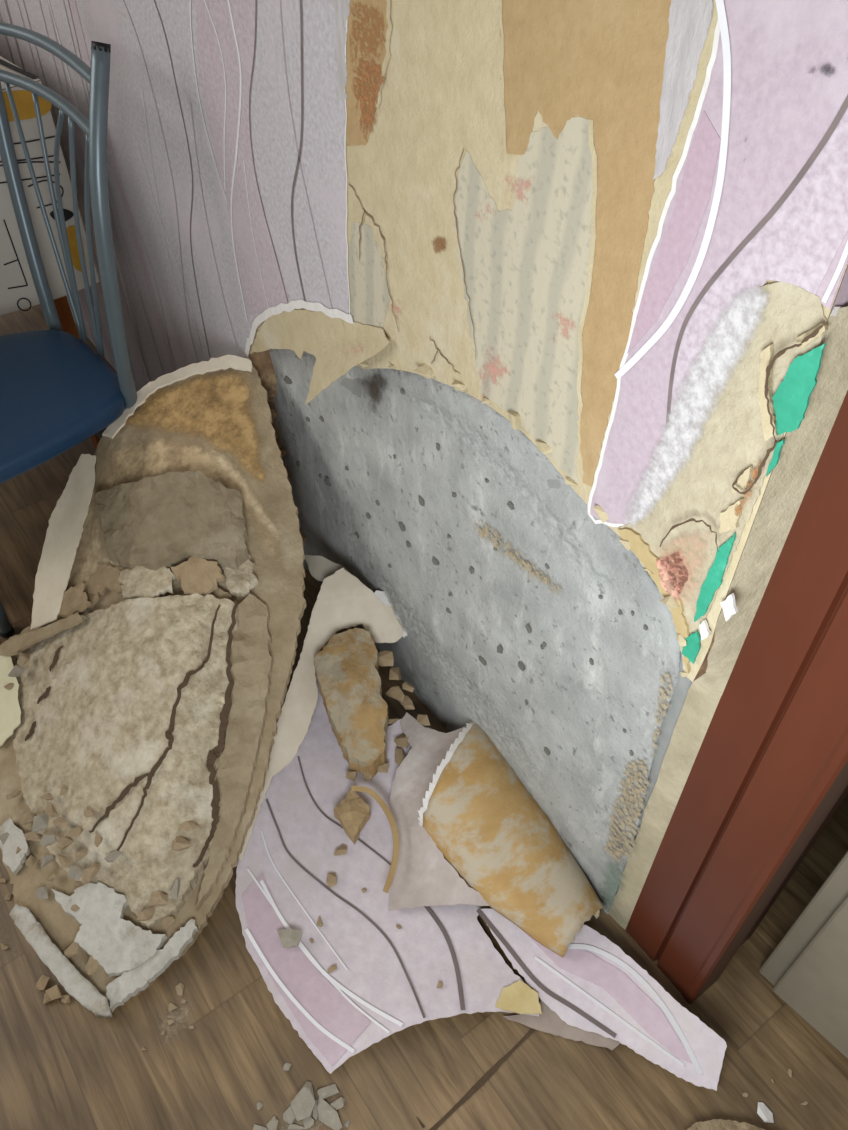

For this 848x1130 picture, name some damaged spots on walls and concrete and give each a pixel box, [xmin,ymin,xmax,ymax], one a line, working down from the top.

corrosion [352,4,385,137]
spalling [245,281,829,914]